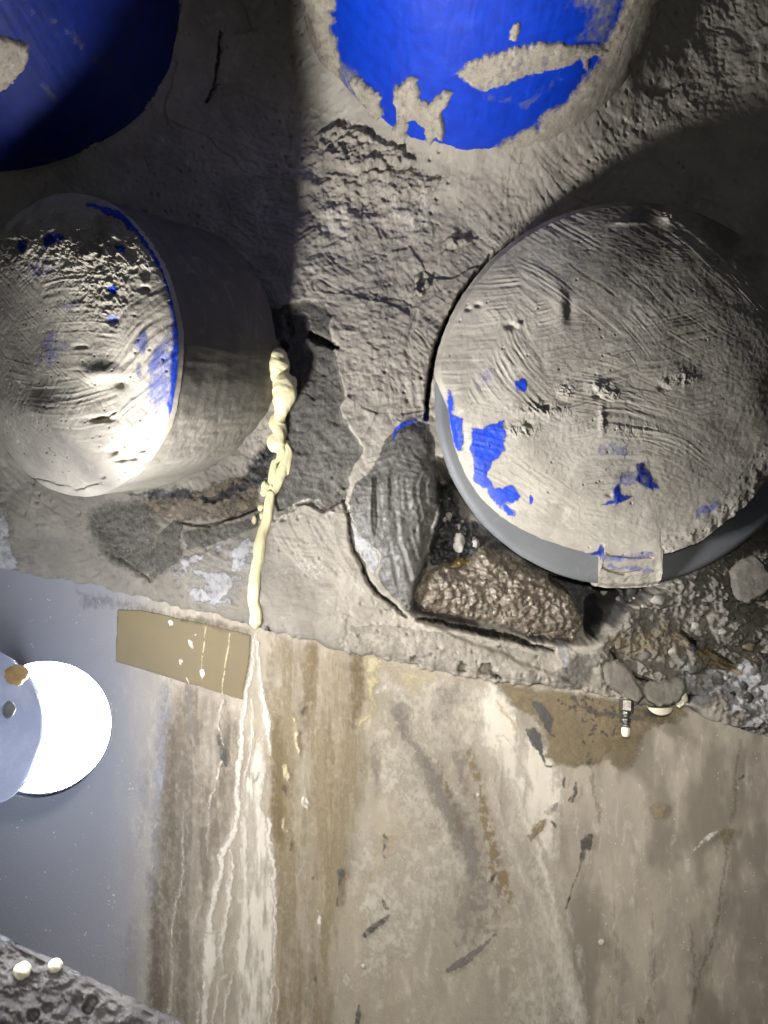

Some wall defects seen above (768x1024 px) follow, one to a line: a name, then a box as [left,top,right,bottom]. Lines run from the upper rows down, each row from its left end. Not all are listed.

crack [205,32,221,103]
crack [425,240,514,419]
spalling [90,444,276,606]
crack [191,509,258,528]
leakage [149,301,687,1024]
spalling [414,483,768,707]